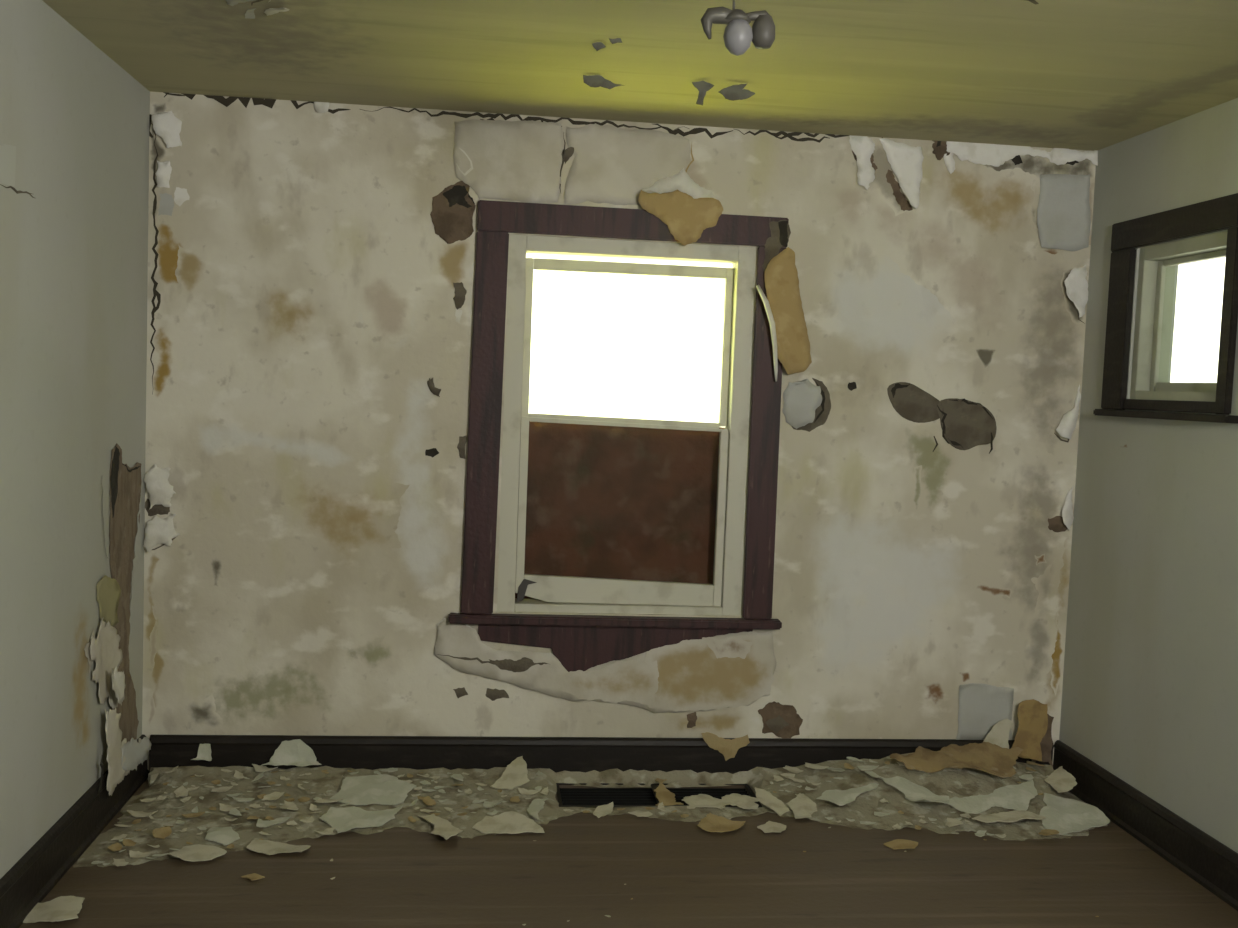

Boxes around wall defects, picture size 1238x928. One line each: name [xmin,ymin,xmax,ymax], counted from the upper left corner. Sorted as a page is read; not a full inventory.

leakage [148,100,209,296]
flaking render [430,181,476,324]
crack [149,92,850,394]
flaking render [870,155,913,211]
flaking render [932,140,1096,181]
leakage [253,282,330,355]
flaking render [887,382,997,454]
leakage [278,466,409,578]
flaking render [101,443,170,772]
leakage [182,632,397,735]
leakage [561,635,775,736]
flaking render [758,701,803,739]